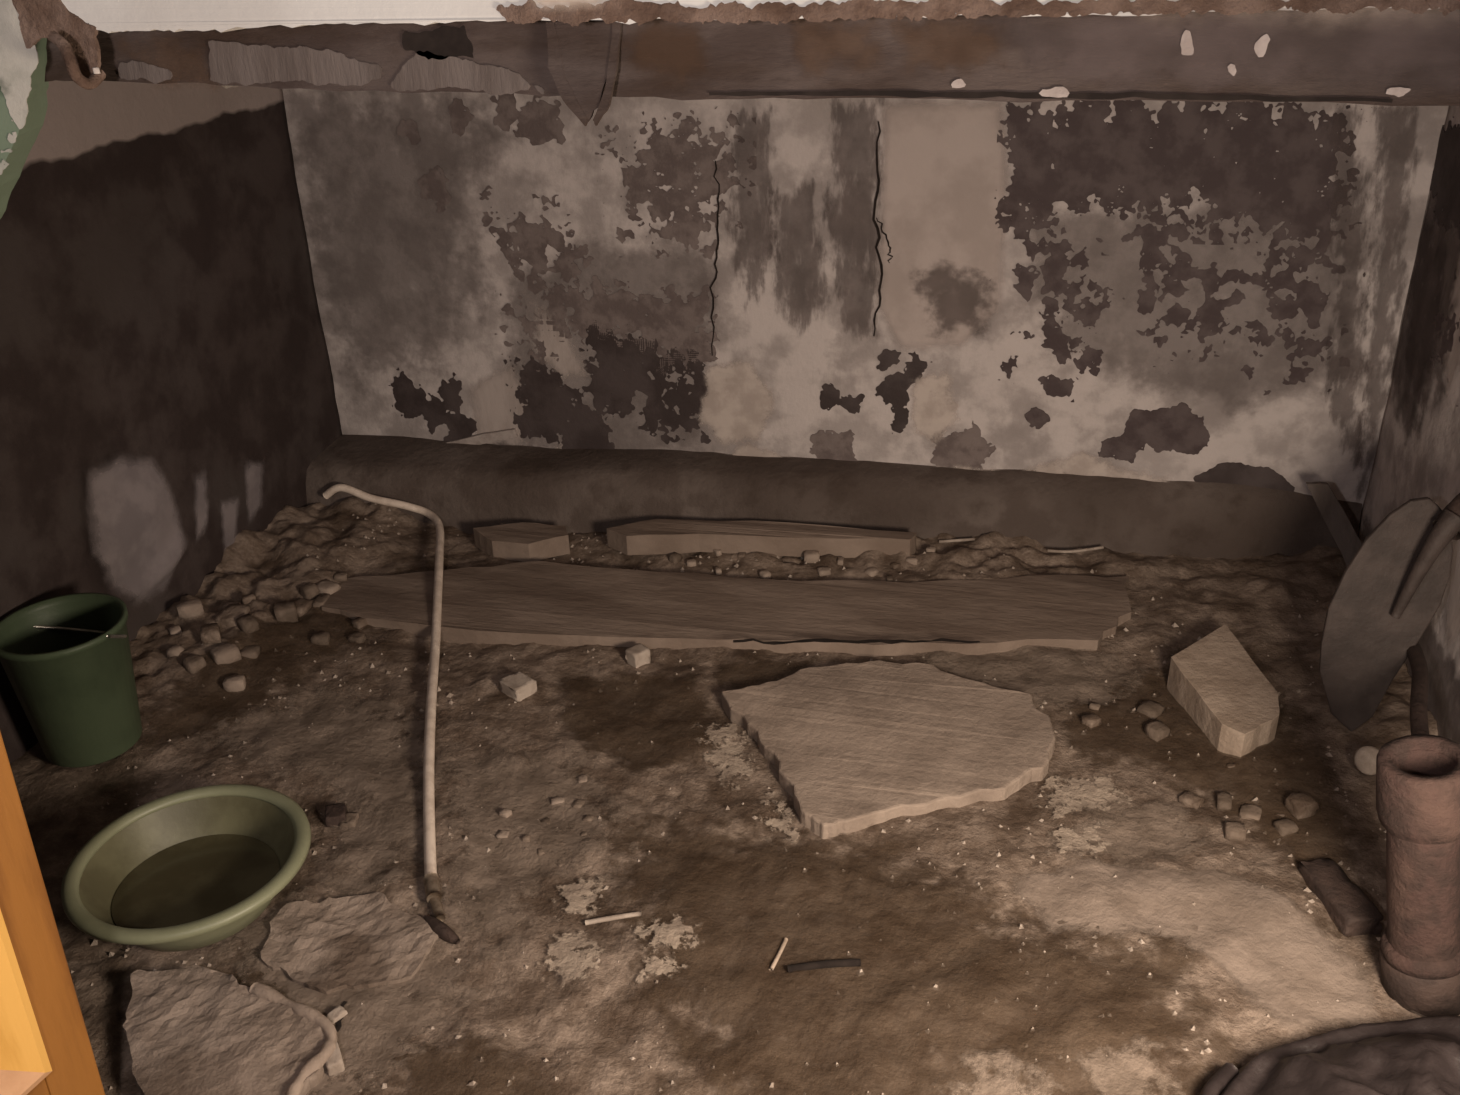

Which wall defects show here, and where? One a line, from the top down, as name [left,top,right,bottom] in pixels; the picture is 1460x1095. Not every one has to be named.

spalling [0,0,173,175]
peeling [951,79,966,88]
peeling [1385,87,1411,97]
peeling [480,185,720,449]
peeling [595,107,757,259]
peeling [994,86,1367,429]
leakage [1391,166,1460,436]
peeling [389,368,477,441]
peeling [810,349,932,461]
peeling [930,421,996,470]